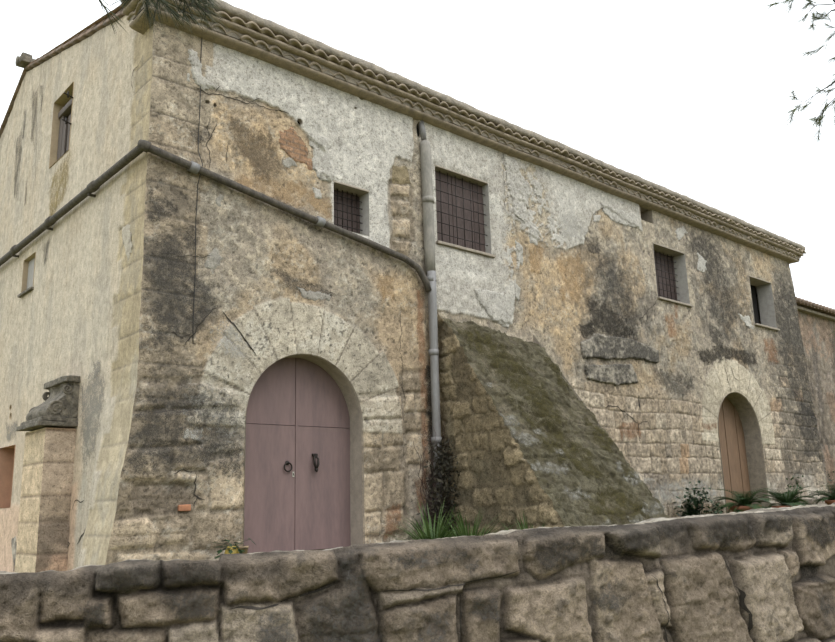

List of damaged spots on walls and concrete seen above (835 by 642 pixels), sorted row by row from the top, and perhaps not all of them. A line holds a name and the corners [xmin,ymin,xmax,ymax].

crack [191,86,289,114]
crack [206,118,229,168]
flaking render [504,156,543,265]